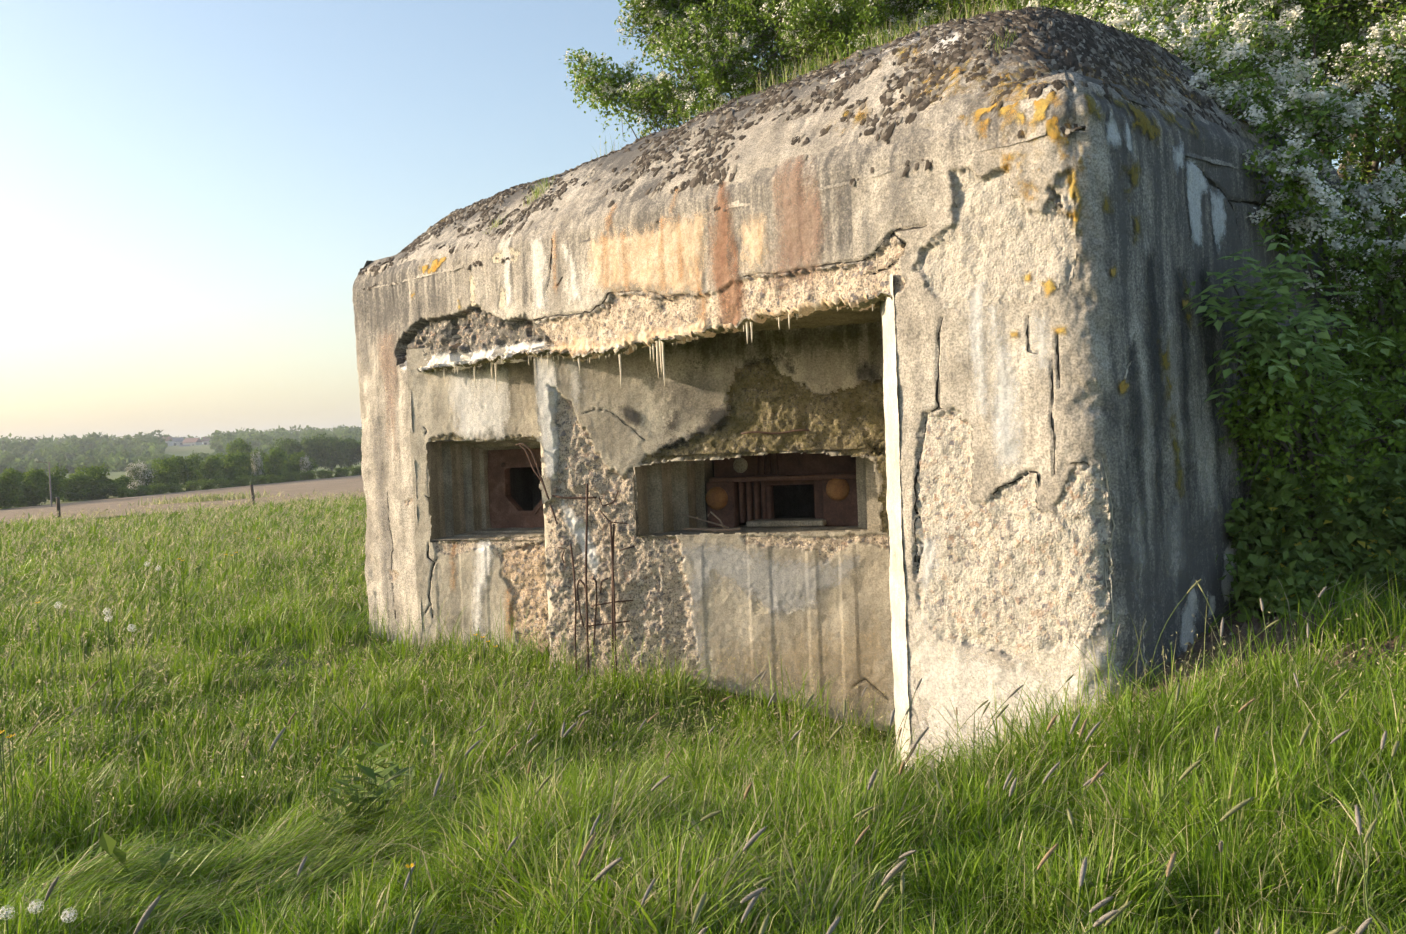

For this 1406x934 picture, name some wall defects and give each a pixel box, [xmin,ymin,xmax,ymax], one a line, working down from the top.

corrosion [698,182,742,326]
flaking render [396,168,1078,367]
water stain [1107,112,1132,150]
water stain [1173,145,1227,249]
water stain [1128,255,1254,576]
spalling [429,356,889,681]
spalling [914,408,1114,658]